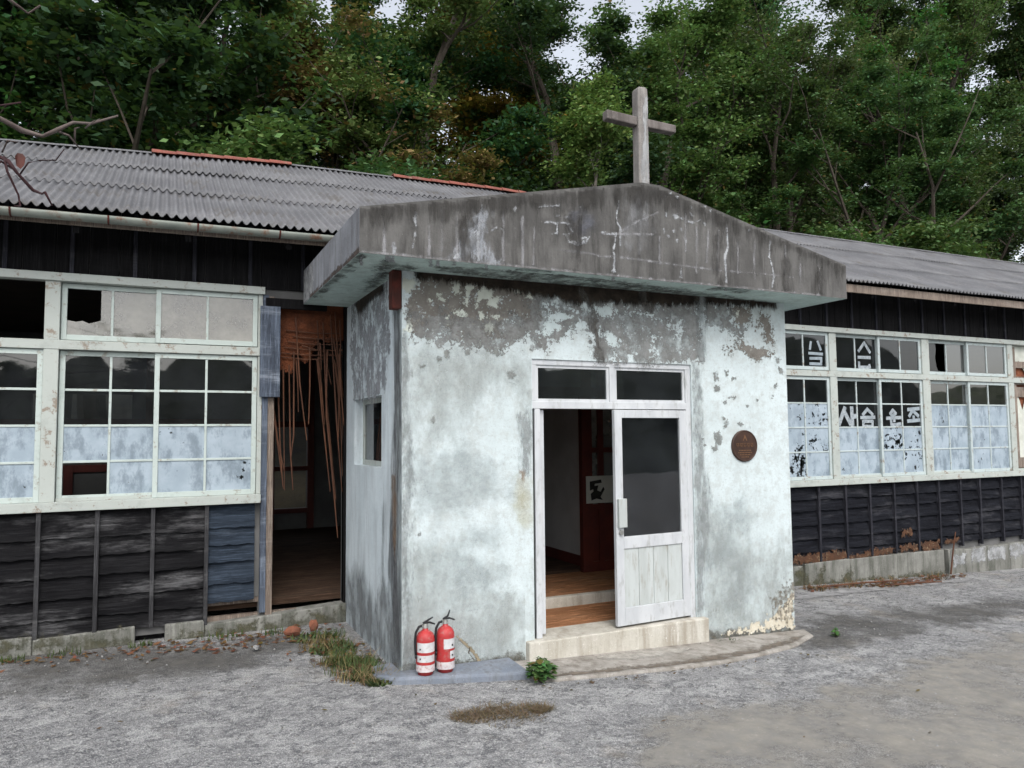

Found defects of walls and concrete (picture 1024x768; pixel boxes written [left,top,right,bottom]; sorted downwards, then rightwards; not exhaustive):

peeling [402,272,784,408]
leakage [346,185,844,676]
peeling [701,417,744,451]
peeling [721,579,795,636]